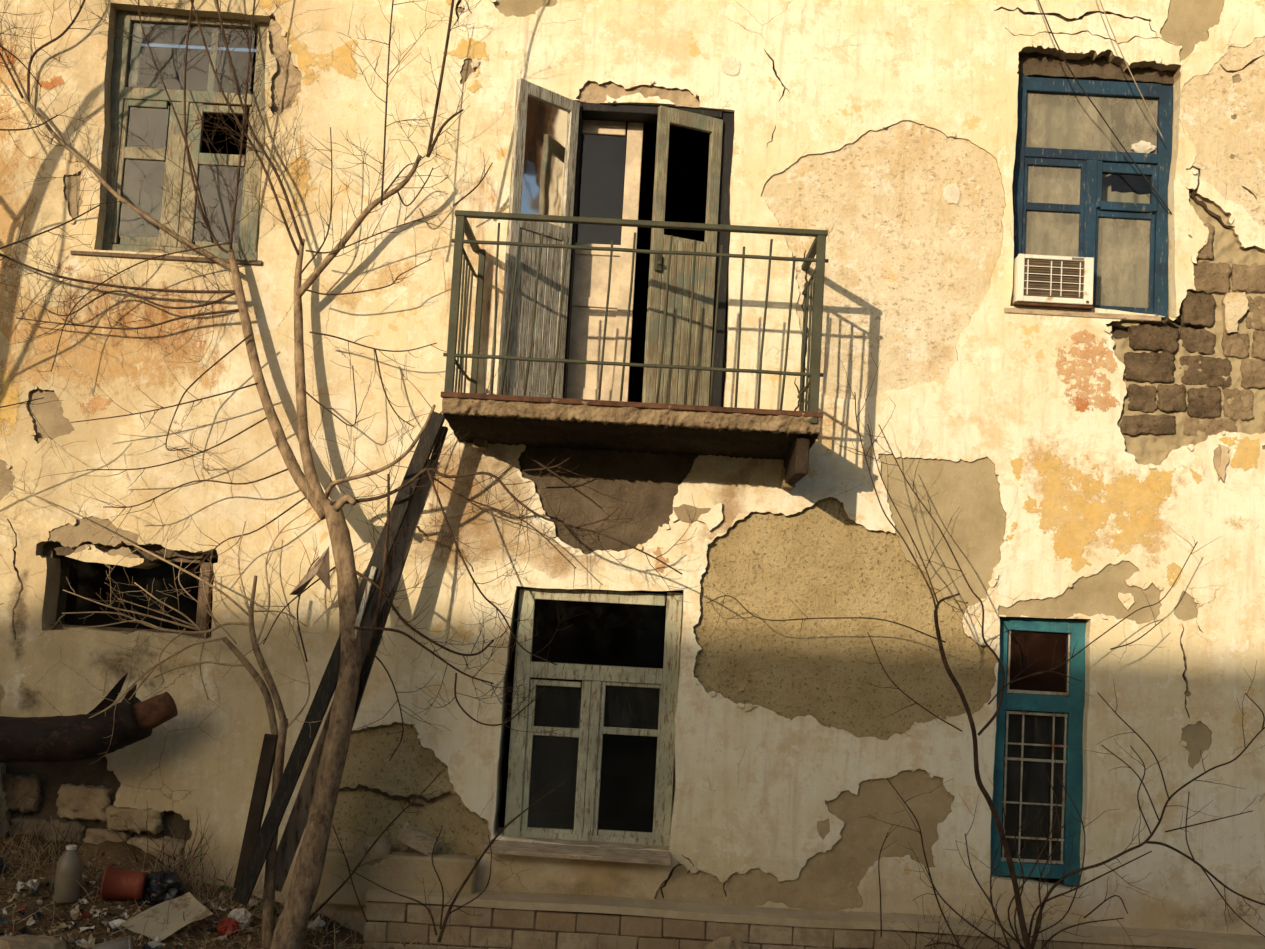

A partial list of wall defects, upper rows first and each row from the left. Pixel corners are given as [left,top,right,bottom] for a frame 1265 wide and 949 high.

peeling [490,0,557,17]
crack [996,8,1150,44]
peeling [1155,0,1224,64]
peeling [0,47,222,443]
peeling [518,36,1265,740]
peeling [0,459,15,500]
crack [1180,631,1188,714]
peeling [1180,721,1211,769]
peeling [327,717,491,858]
peeling [654,768,954,913]